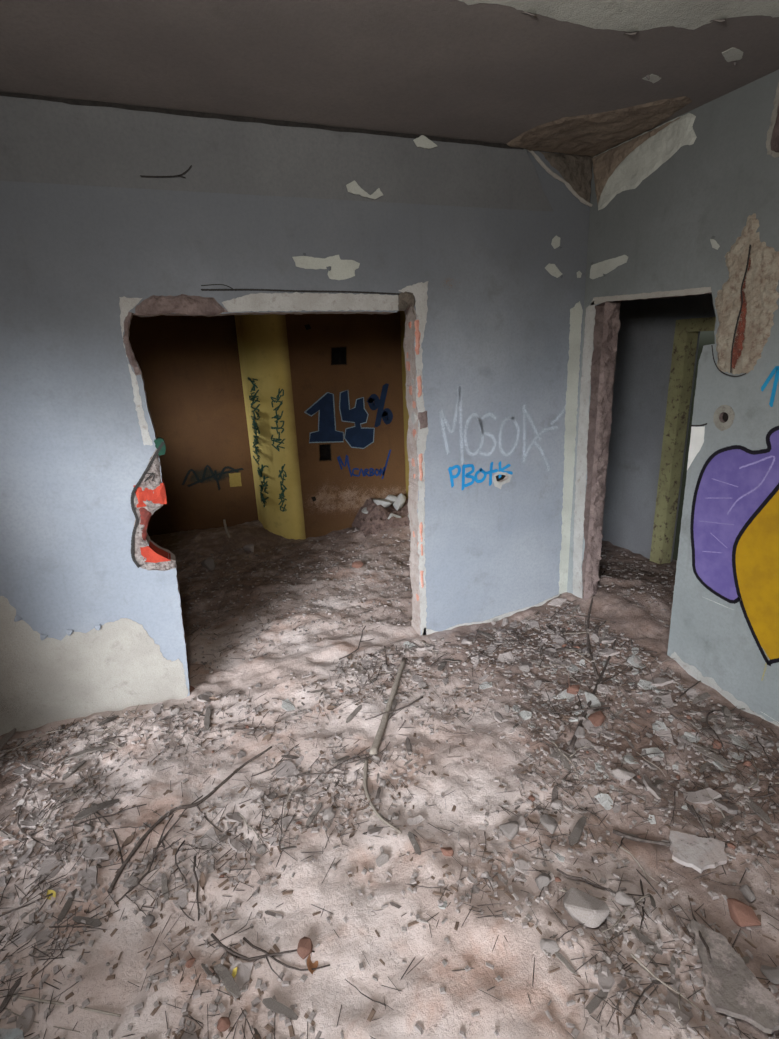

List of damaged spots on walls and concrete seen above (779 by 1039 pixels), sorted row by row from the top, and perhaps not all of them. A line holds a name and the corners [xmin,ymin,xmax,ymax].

peeling [458,0,779,35]
peeling [722,47,743,66]
peeling [413,135,437,149]
flaking render [507,96,697,210]
spalling [766,82,779,158]
flaking render [119,213,779,635]
peeling [0,596,188,736]
peeling [670,651,779,727]